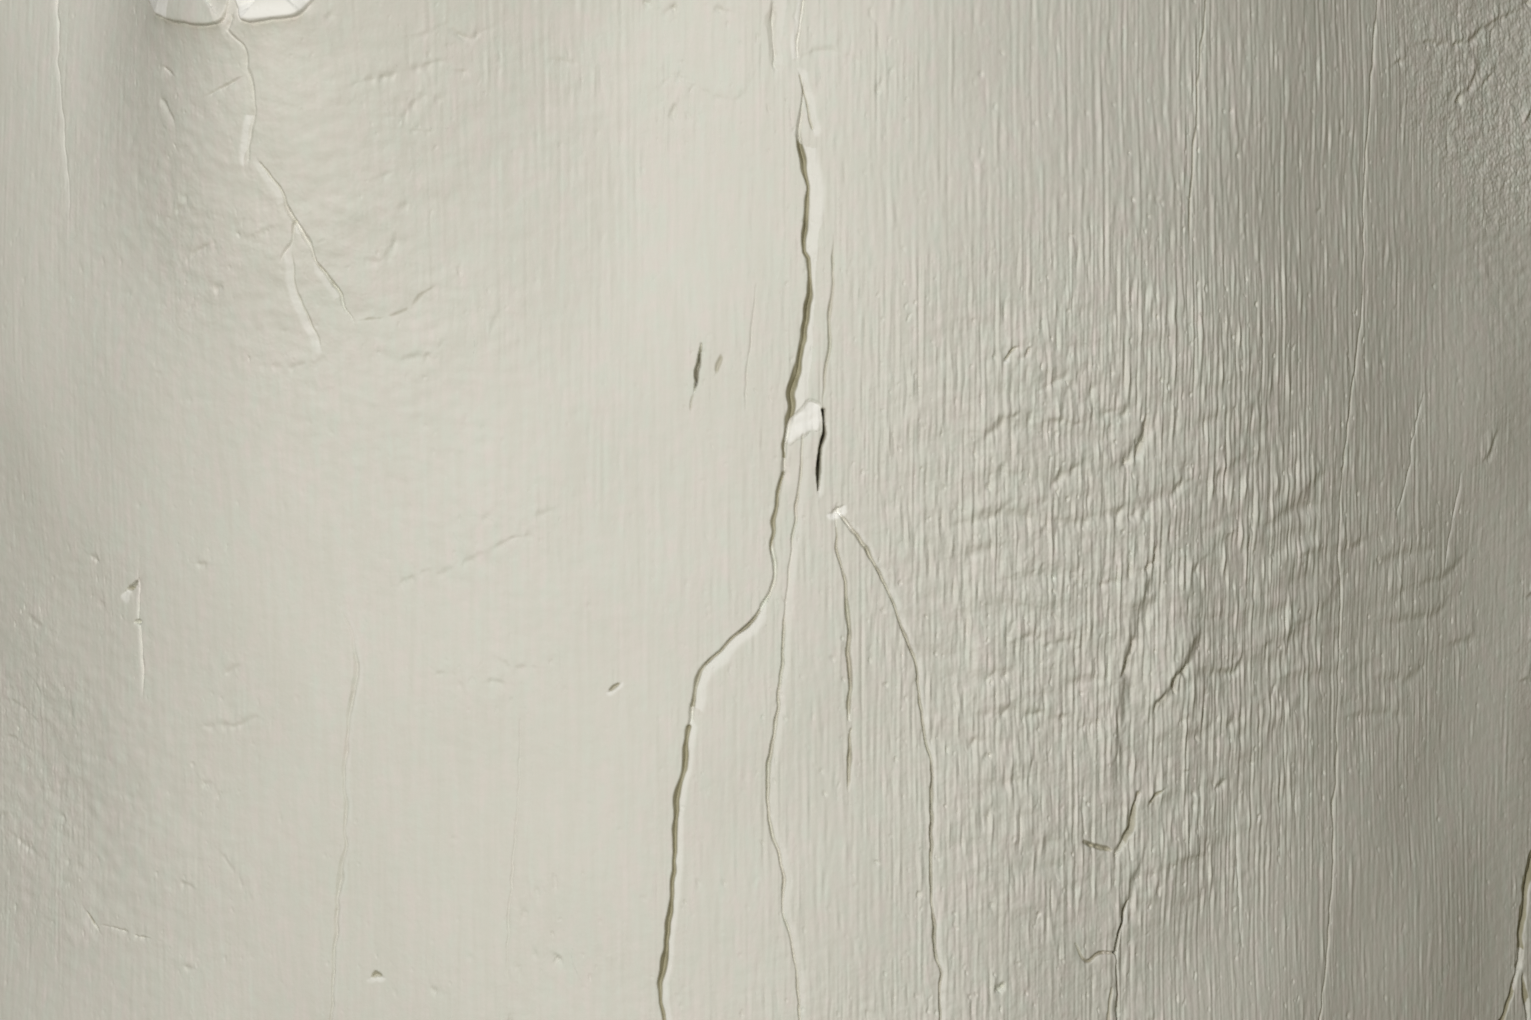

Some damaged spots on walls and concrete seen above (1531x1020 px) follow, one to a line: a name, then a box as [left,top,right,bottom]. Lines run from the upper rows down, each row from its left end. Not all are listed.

crack [640,0,958,1020]
crack [1491,824,1531,1020]